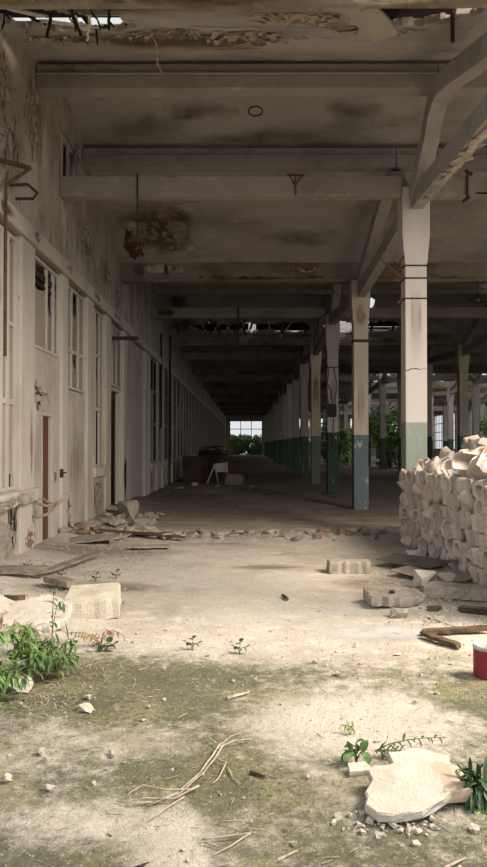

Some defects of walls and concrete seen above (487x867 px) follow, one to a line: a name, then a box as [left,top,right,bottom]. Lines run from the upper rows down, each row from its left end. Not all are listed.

peeling [25,11,367,48]
peeling [423,129,487,202]
spalling [124,230,144,262]
spalling [0,496,36,562]